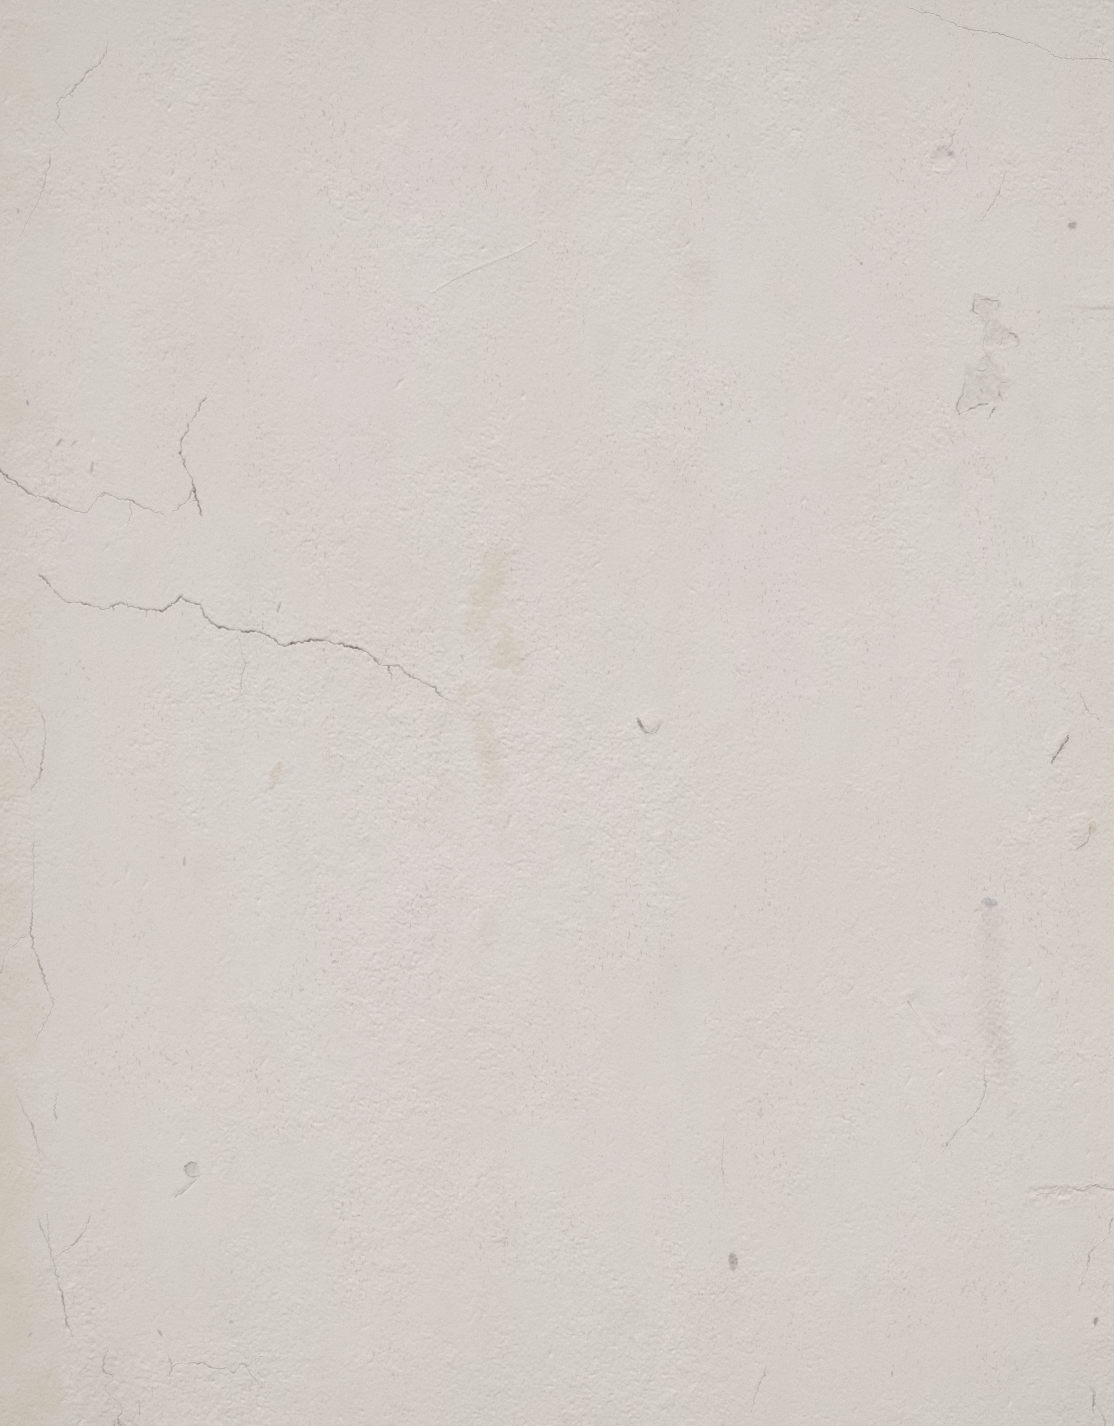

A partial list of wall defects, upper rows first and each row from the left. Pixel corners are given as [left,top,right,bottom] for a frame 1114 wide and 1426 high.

crack [0,397,207,527]
crack [38,574,451,701]